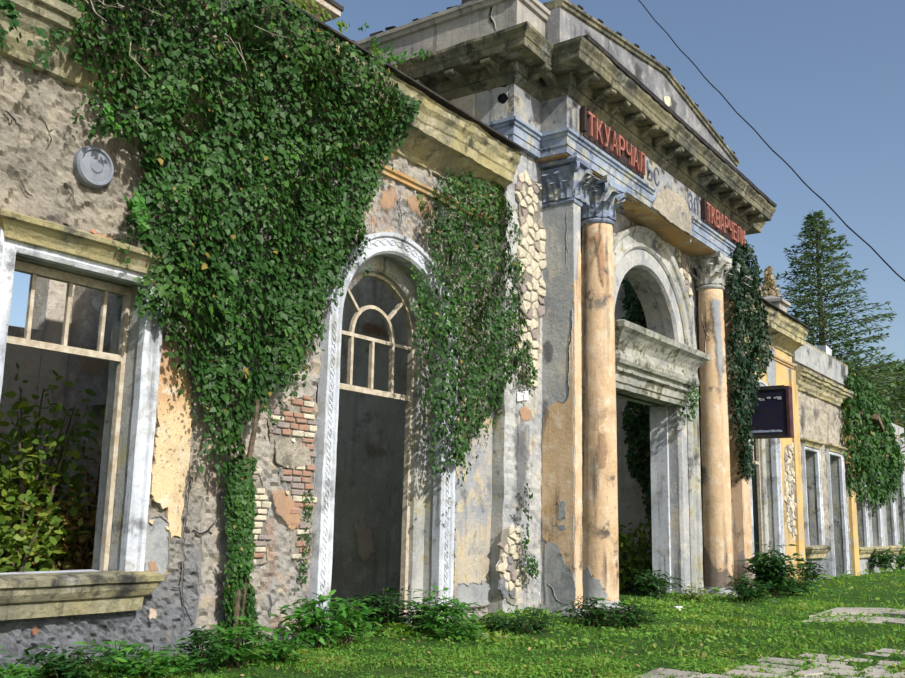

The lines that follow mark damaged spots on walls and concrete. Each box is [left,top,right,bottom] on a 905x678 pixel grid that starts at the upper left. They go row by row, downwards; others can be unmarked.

crack [4,110,53,146]
flaking render [246,391,317,567]
flaking render [144,512,170,584]